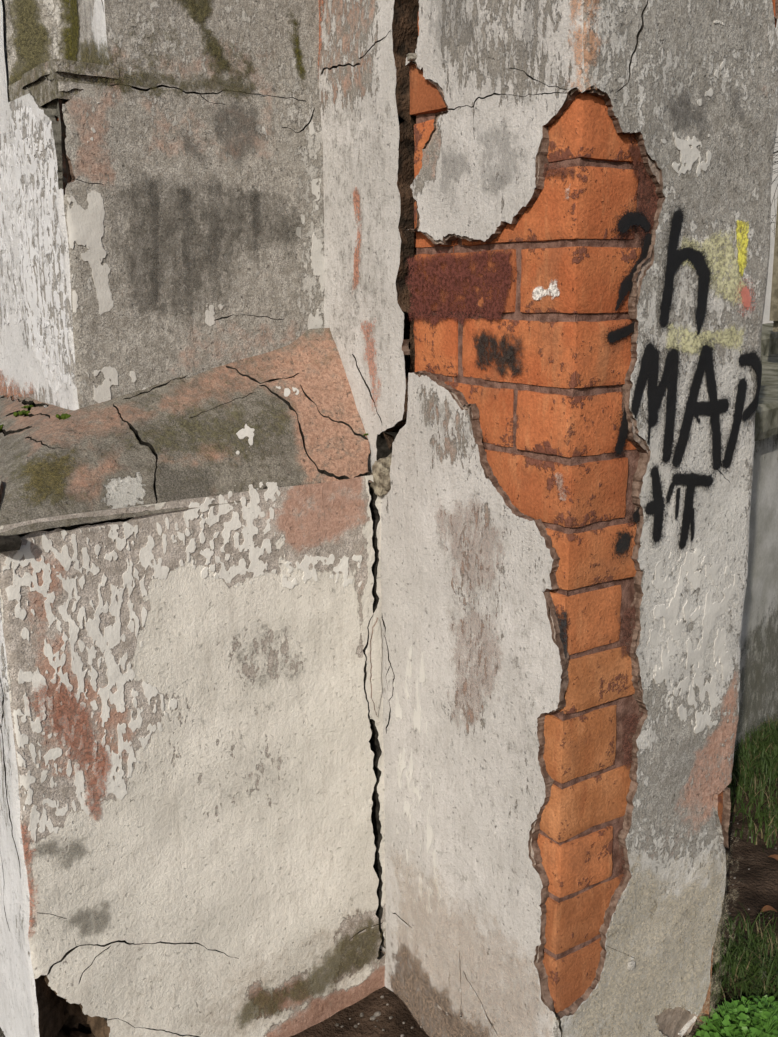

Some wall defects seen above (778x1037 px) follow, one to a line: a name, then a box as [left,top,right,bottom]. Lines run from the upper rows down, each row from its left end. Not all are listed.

leakage [62,0,255,99]
spalling [406,59,451,181]
peeling [0,76,114,395]
crack [0,395,63,449]
crack [0,517,133,553]
crack [113,374,190,504]
crack [190,0,419,960]
spalling [393,86,746,1020]
peeling [2,482,362,841]
crack [37,912,239,983]
leakage [240,920,382,1027]
leakage [389,946,488,1037]